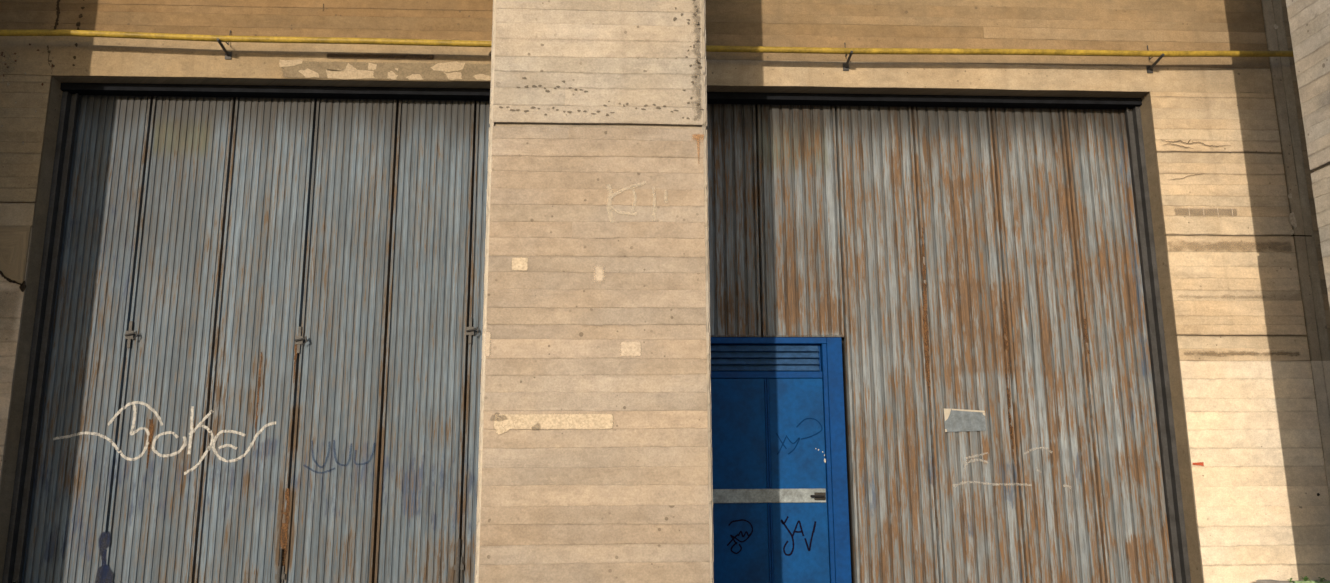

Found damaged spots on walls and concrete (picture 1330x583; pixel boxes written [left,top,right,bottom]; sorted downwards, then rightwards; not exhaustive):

crack [47,0,85,74]
peeling [279,59,491,81]
rust [922,228,930,400]
rust [1003,301,1015,462]